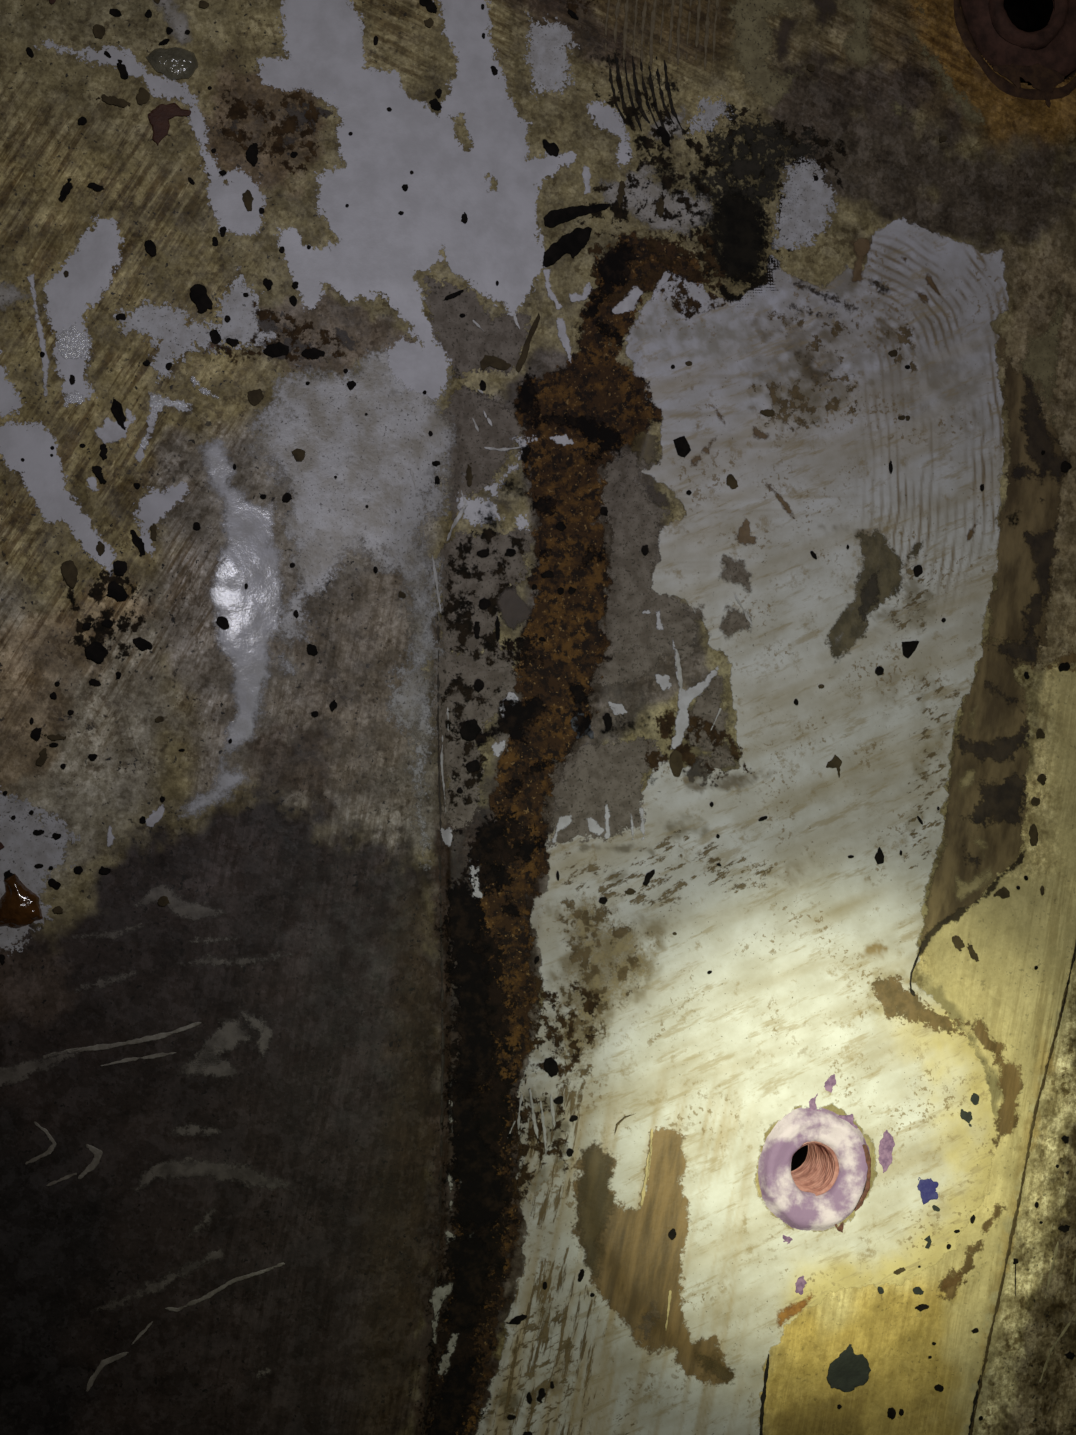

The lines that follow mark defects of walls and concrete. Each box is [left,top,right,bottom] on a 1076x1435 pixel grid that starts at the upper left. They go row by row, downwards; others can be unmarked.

peeling [650,95,733,139]
peeling [728,0,802,108]
peeling [0,214,125,407]
peeling [0,350,117,576]
peeling [34,0,712,1132]
water stain [919,334,1076,956]
peeling [0,785,80,957]
corrosion [436,230,708,1435]
peeling [476,156,1009,1435]
peeling [429,1283,459,1375]
water stain [571,1126,734,1385]
crack [968,943,1076,1435]